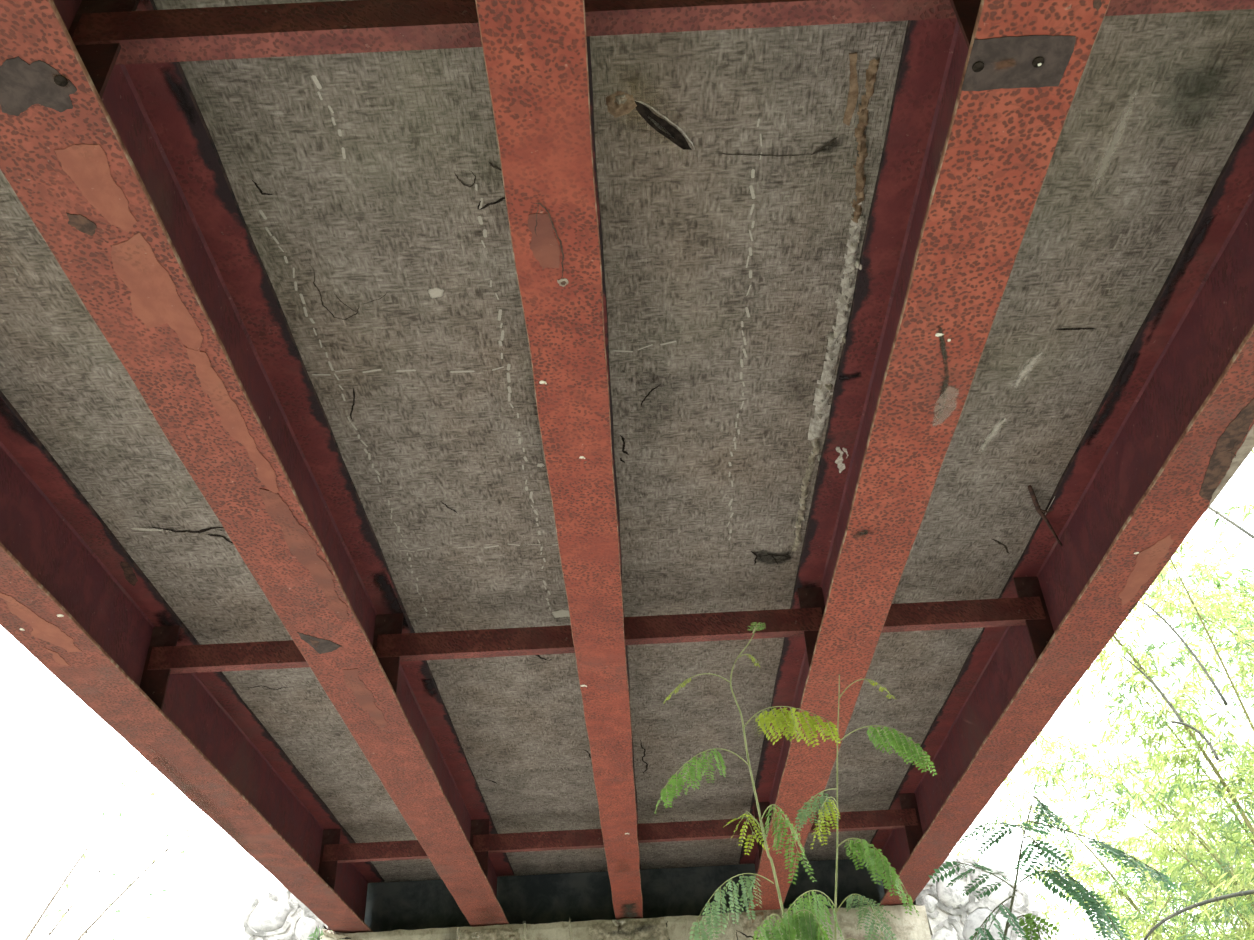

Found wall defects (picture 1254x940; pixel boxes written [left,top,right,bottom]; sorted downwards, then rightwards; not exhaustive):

peeling [0,56,77,116]
peeling [54,144,279,494]
crack [142,527,233,543]
rust [621,903,638,918]
spalling [461,927,520,940]
spalling [589,917,669,940]